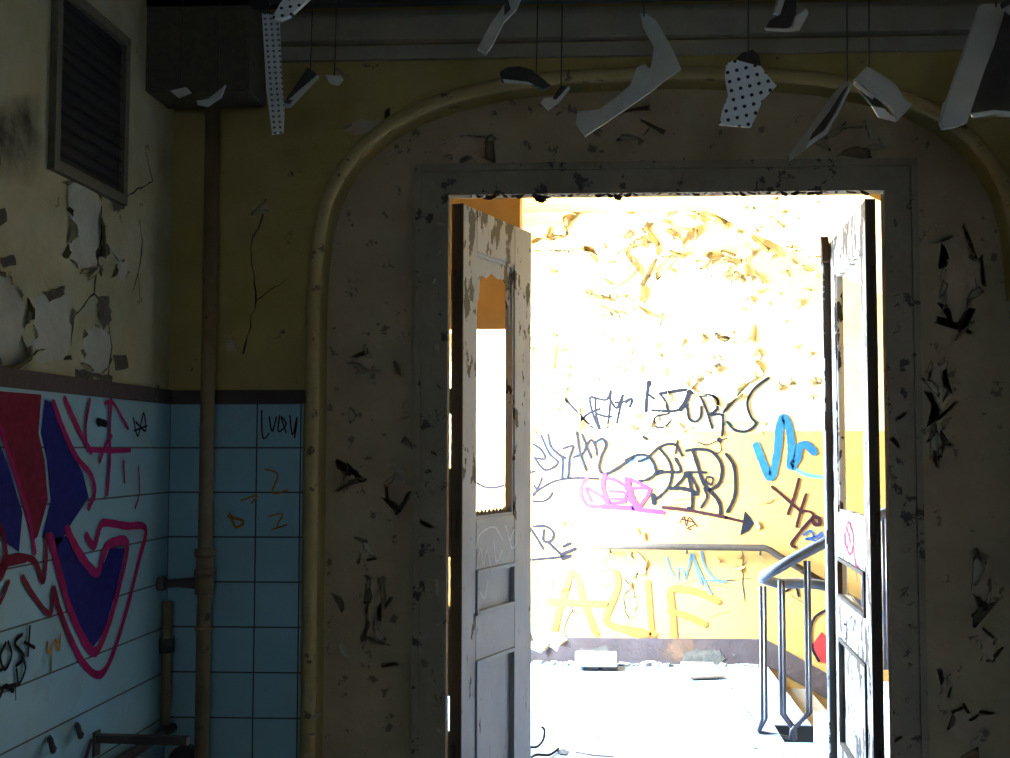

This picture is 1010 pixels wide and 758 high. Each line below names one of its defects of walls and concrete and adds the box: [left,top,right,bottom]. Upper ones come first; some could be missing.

peeling [470,189,870,434]